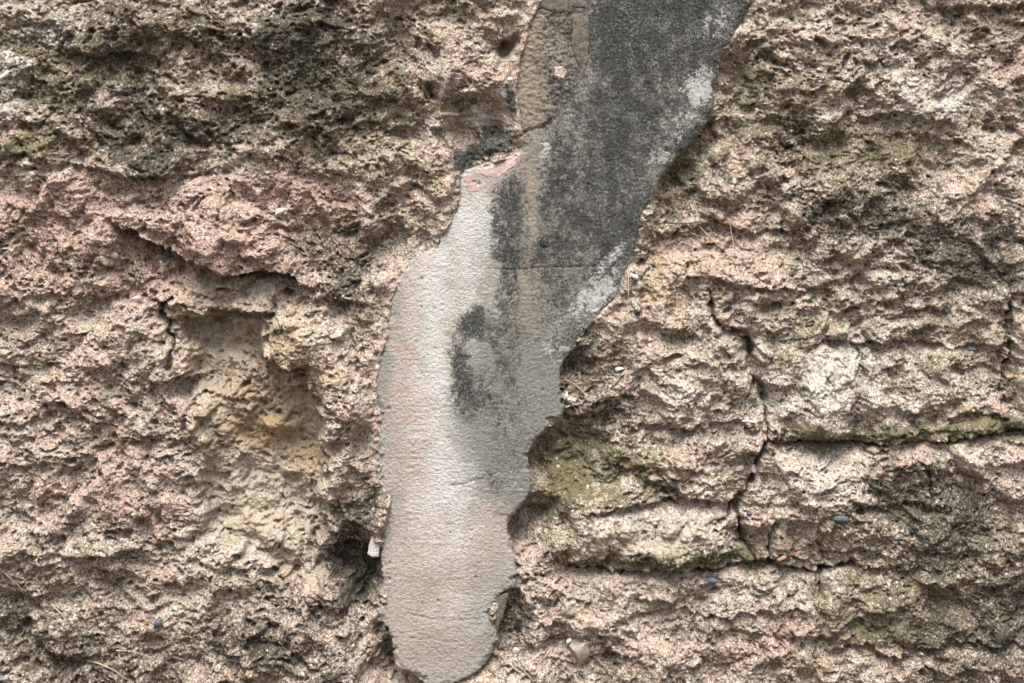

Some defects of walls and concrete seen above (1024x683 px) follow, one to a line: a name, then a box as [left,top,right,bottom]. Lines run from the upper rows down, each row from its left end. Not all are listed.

water stain [449,0,751,454]
crack [709,298,721,327]
crack [742,336,754,353]
crack [852,343,865,383]
crack [997,287,1014,390]
crack [939,428,1023,448]
crack [650,392,911,594]
crack [567,563,625,574]